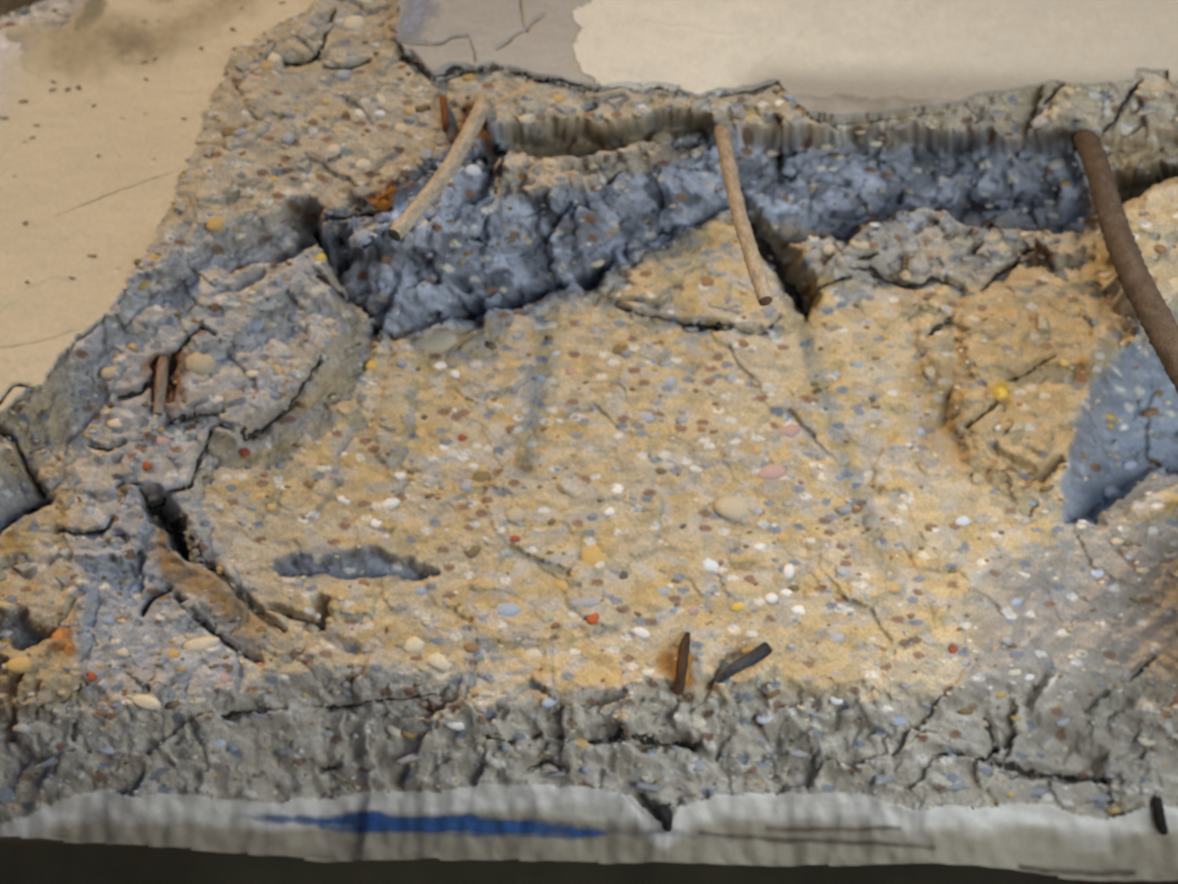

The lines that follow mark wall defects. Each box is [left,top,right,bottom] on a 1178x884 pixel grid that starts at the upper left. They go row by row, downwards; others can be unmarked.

rust [452,103,475,143]
rust [476,118,492,151]
spalling [311,0,1178,394]
crack [316,209,390,313]
crack [606,223,1034,335]
rust [145,355,186,407]
crack [173,326,215,358]
spalling [0,0,492,720]
crack [117,355,323,632]
spalling [0,211,1178,825]
crack [141,590,256,664]
rust [661,652,695,688]